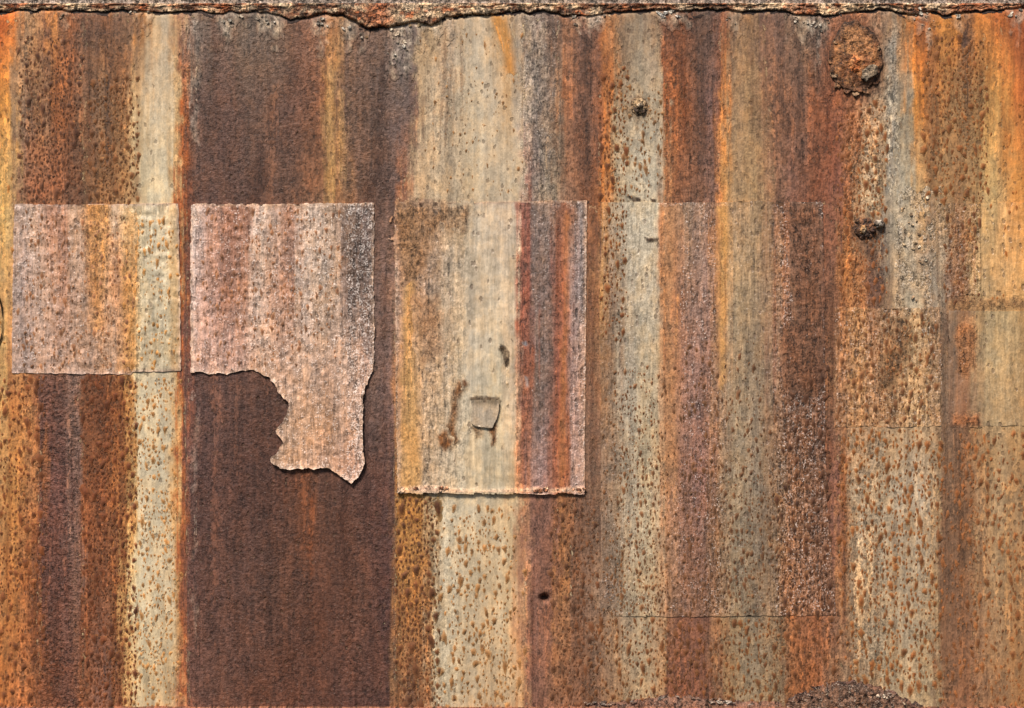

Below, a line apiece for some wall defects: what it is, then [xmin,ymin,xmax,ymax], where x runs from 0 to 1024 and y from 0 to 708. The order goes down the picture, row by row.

rust [0,12,780,707]
rust [723,12,1024,707]